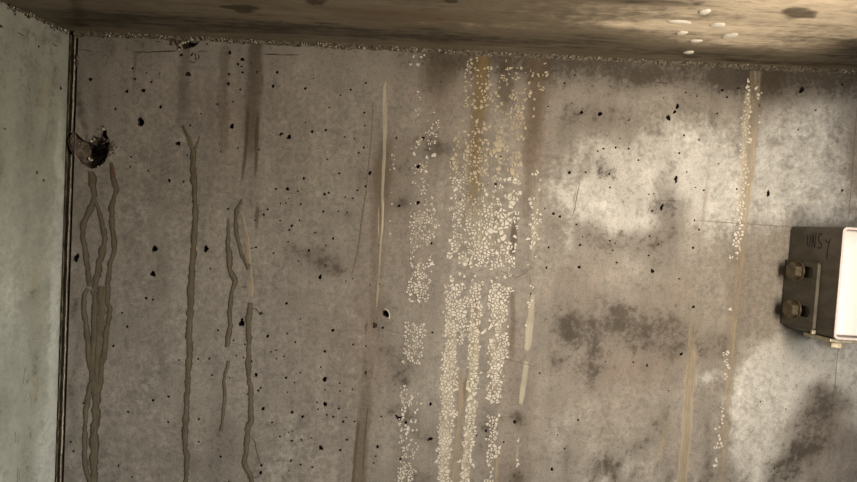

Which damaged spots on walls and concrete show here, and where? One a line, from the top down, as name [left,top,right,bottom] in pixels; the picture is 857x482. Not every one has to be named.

spalling [68,125,117,169]
water stain [397,385,423,482]
water stain [402,322,427,364]
water stain [406,91,440,303]
water stain [434,57,549,482]
water stain [713,306,738,467]
water stain [729,75,762,293]